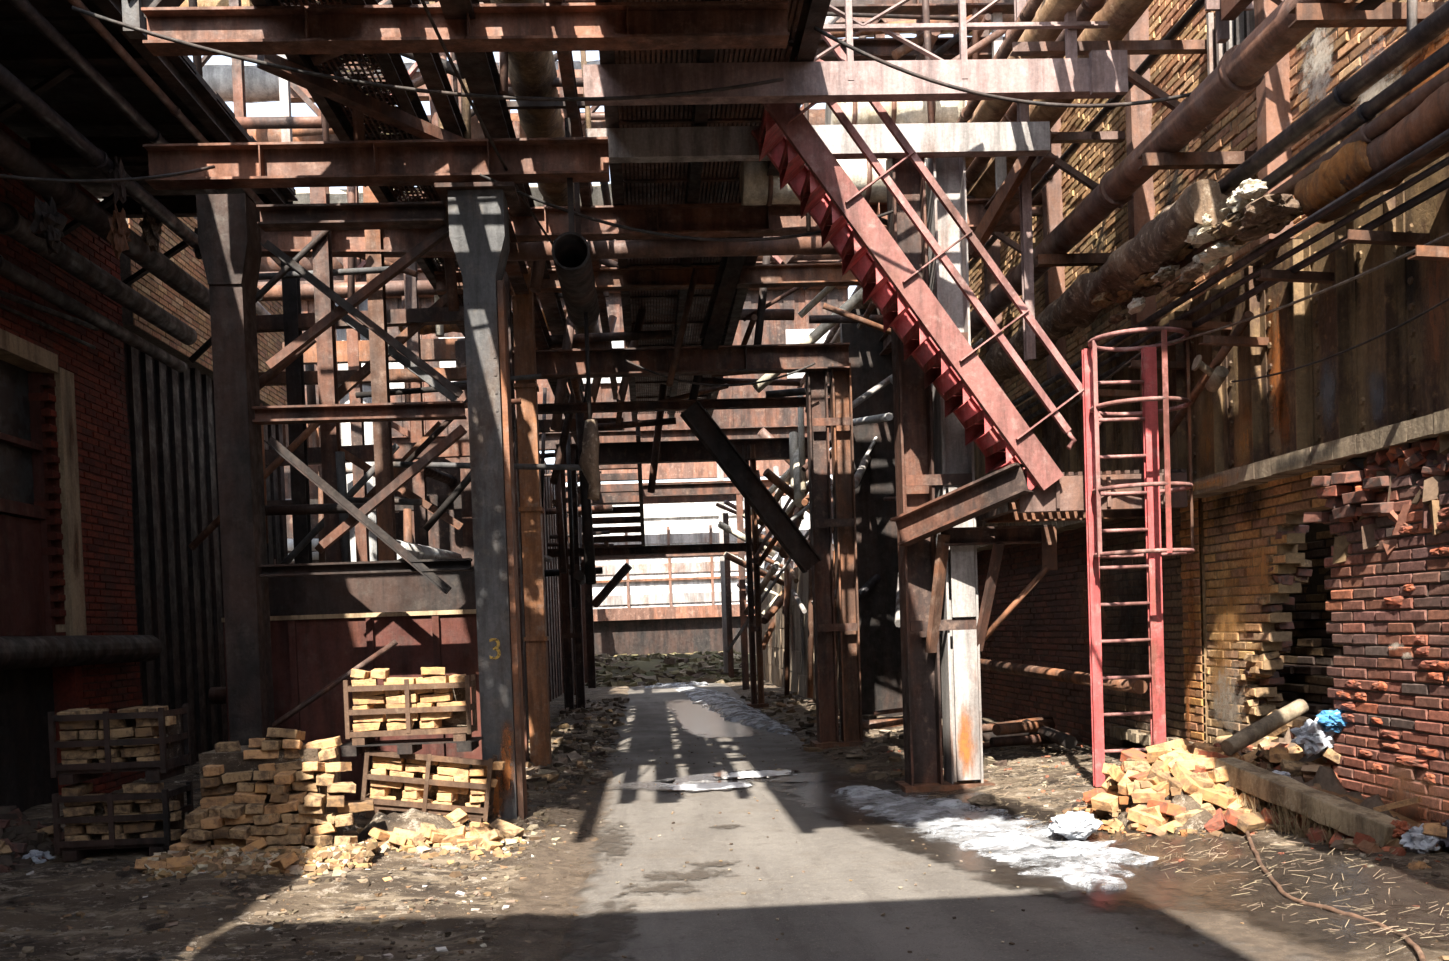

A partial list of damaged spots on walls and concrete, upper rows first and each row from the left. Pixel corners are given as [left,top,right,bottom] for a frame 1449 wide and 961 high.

rust [1265,303,1289,442]
spalling [1392,508,1449,534]
spalling [1430,546,1449,555]
spalling [1384,584,1416,605]
spalling [1237,524,1313,721]
spalling [1414,636,1449,682]
rust [958,716,972,769]
spalling [1336,680,1439,783]